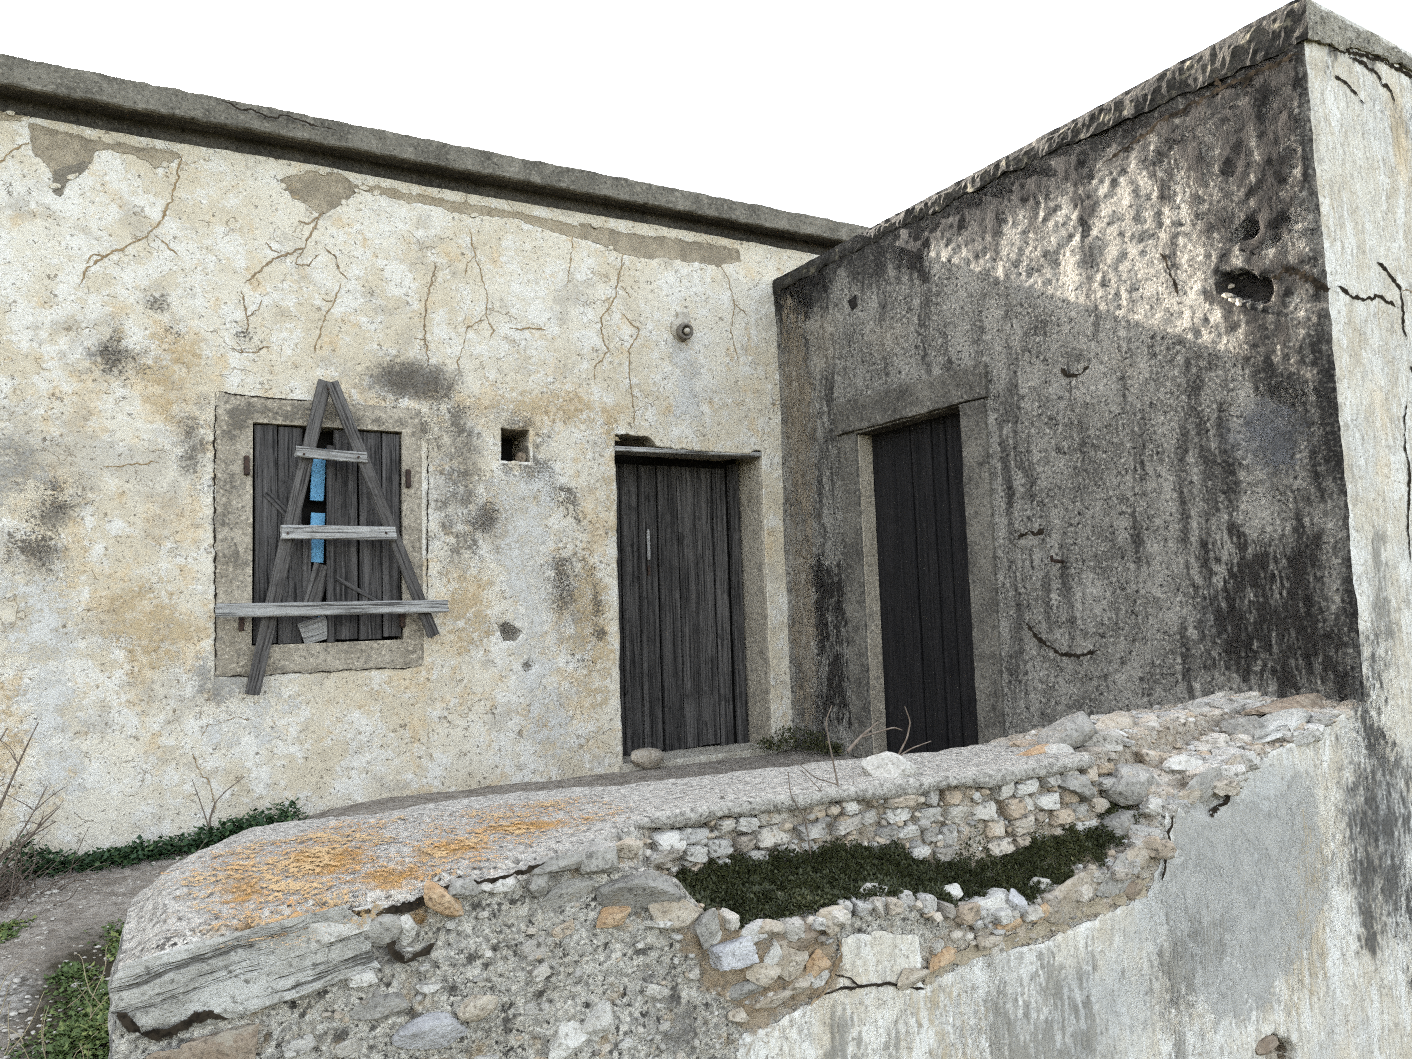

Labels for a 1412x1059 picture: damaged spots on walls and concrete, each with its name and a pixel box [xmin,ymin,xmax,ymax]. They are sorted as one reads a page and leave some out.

flaking render [0,111,181,196]
crack [79,154,183,286]
crack [229,211,348,353]
flaking render [280,168,741,267]
water stain [892,142,1099,283]
water stain [1105,48,1323,373]
spalling [1221,272,1273,312]
crack [1271,262,1412,370]
water stain [91,295,620,657]
crack [1403,405,1411,560]
water stain [1151,521,1412,1059]
spalling [1255,1035,1286,1059]